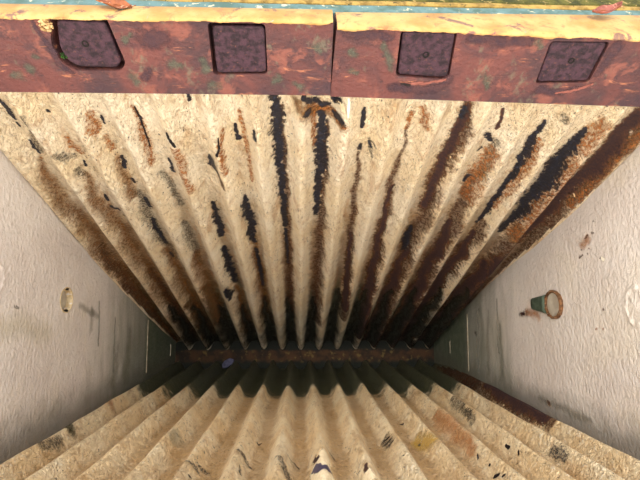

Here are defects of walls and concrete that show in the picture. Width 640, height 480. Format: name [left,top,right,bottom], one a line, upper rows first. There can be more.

corrosion [31,19,75,74]
corrosion [140,29,170,49]
corrosion [342,30,395,42]
corrosion [387,75,453,94]
corrosion [466,34,535,48]
corrosion [533,40,623,96]
corrosion [130,105,156,167]
corrosion [305,103,347,147]
corrosion [21,116,198,342]
corrosion [455,107,640,318]
corrosion [437,366,557,432]